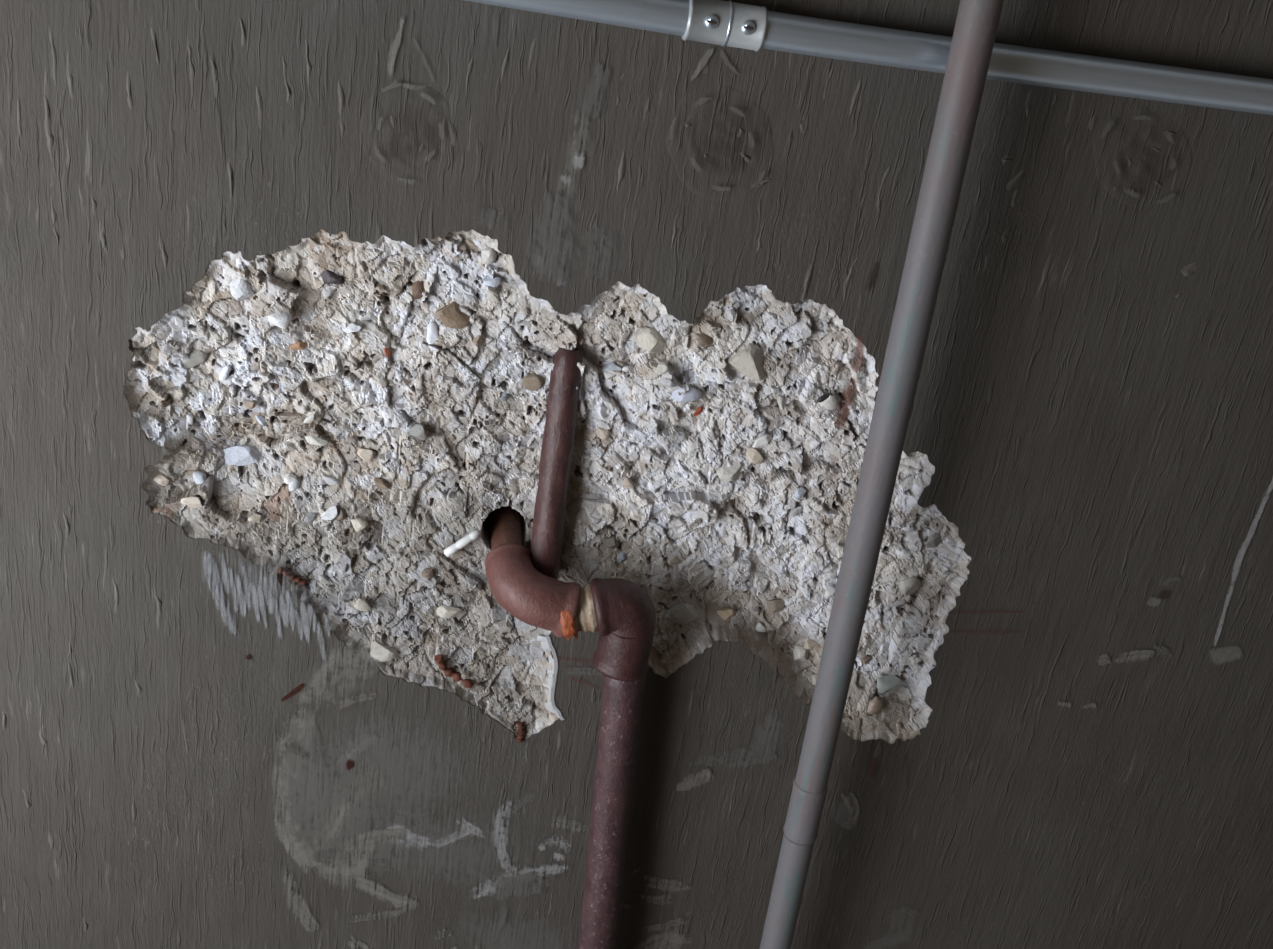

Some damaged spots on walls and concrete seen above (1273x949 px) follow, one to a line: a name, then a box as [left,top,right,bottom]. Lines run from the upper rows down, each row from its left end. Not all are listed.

peeling [43,26,74,247]
spalling [123,229,879,740]
spalling [840,451,972,744]